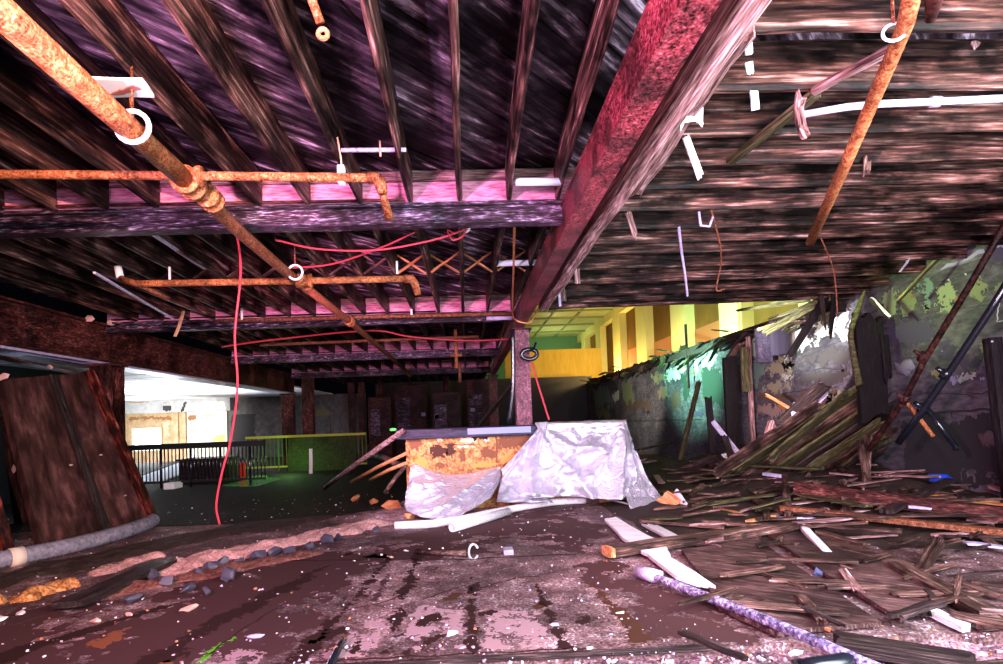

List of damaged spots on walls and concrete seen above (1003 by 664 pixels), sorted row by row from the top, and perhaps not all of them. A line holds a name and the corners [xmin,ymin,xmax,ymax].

spalling [744,307,851,420]
corrosion [408,435,531,471]